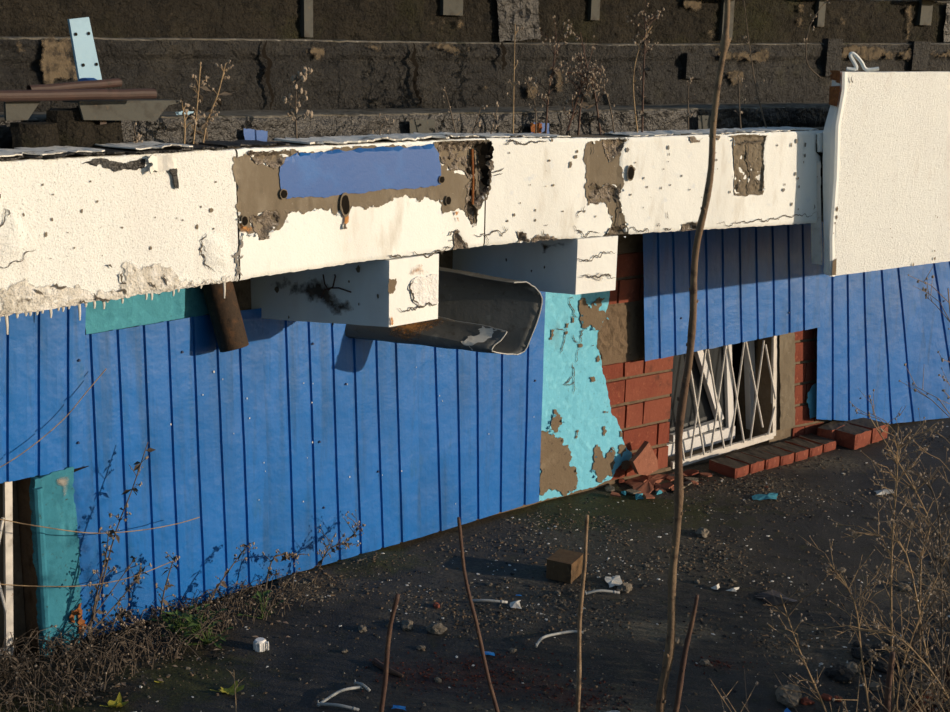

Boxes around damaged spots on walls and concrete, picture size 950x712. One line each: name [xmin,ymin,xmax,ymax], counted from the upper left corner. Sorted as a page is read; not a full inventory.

peeling [83,158,146,172]
peeling [232,140,494,240]
peeling [569,137,636,238]
peeling [716,134,768,197]
spalling [453,229,470,250]
spalling [0,255,233,335]
peeling [550,297,609,340]
crack [557,189,671,394]
peeling [539,409,579,496]
peeling [592,426,631,483]